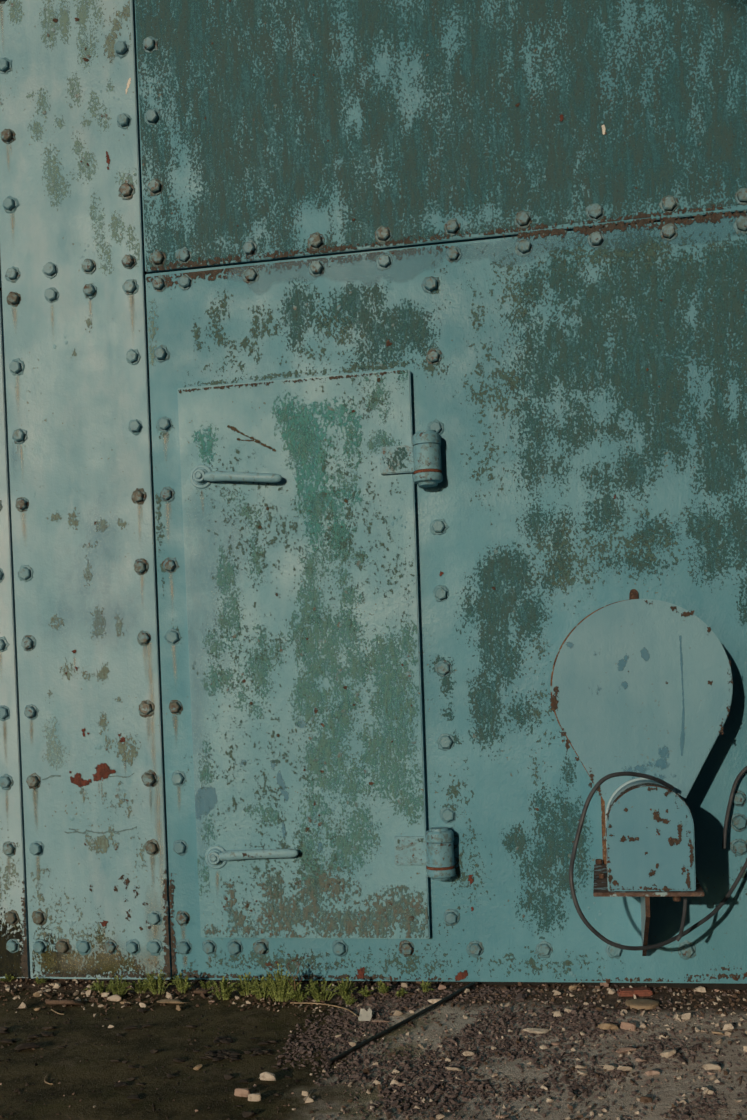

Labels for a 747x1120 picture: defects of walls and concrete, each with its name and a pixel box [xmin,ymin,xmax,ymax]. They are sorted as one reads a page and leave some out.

rust [146,204,747,287]
peeling [26,0,747,757]
rust [69,763,116,788]
peeling [80,781,146,867]
peeling [99,713,141,765]
rust [178,370,414,913]
peeling [179,278,495,914]
peeling [501,755,594,939]
rust [550,686,559,712]
rust [588,768,694,892]
rust [0,837,747,984]